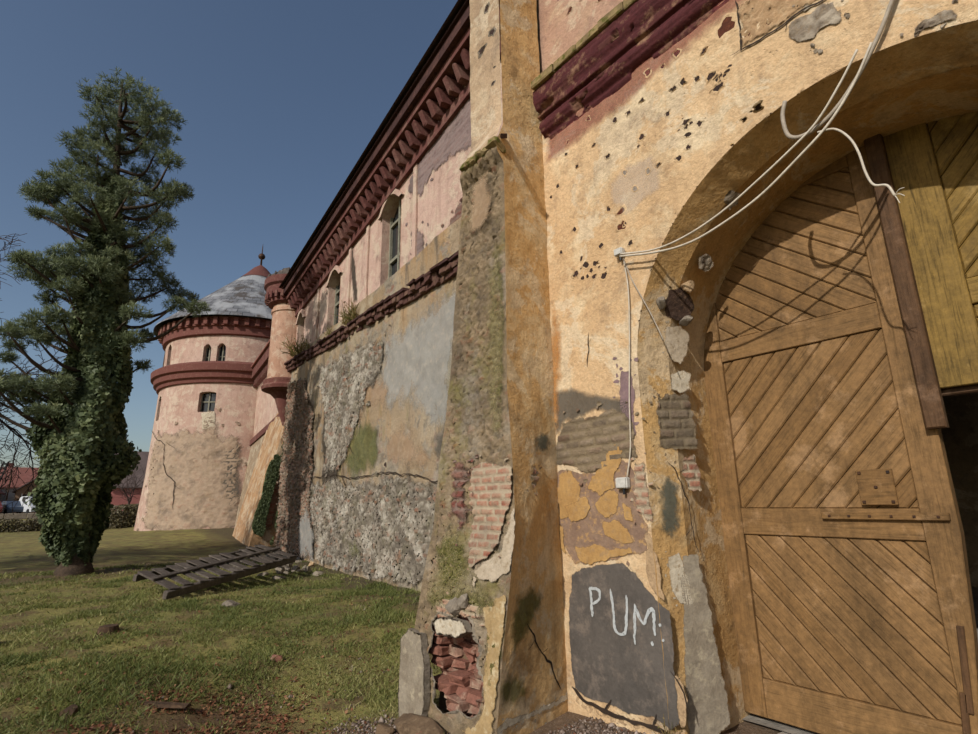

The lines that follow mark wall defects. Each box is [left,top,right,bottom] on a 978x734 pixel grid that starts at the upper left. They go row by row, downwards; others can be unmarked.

spalling [788,0,850,54]
flaking render [408,98,471,199]
crack [151,430,175,509]
flaking render [448,450,513,586]
flaking render [555,286,702,606]
spalling [398,592,487,720]
crack [528,625,667,734]